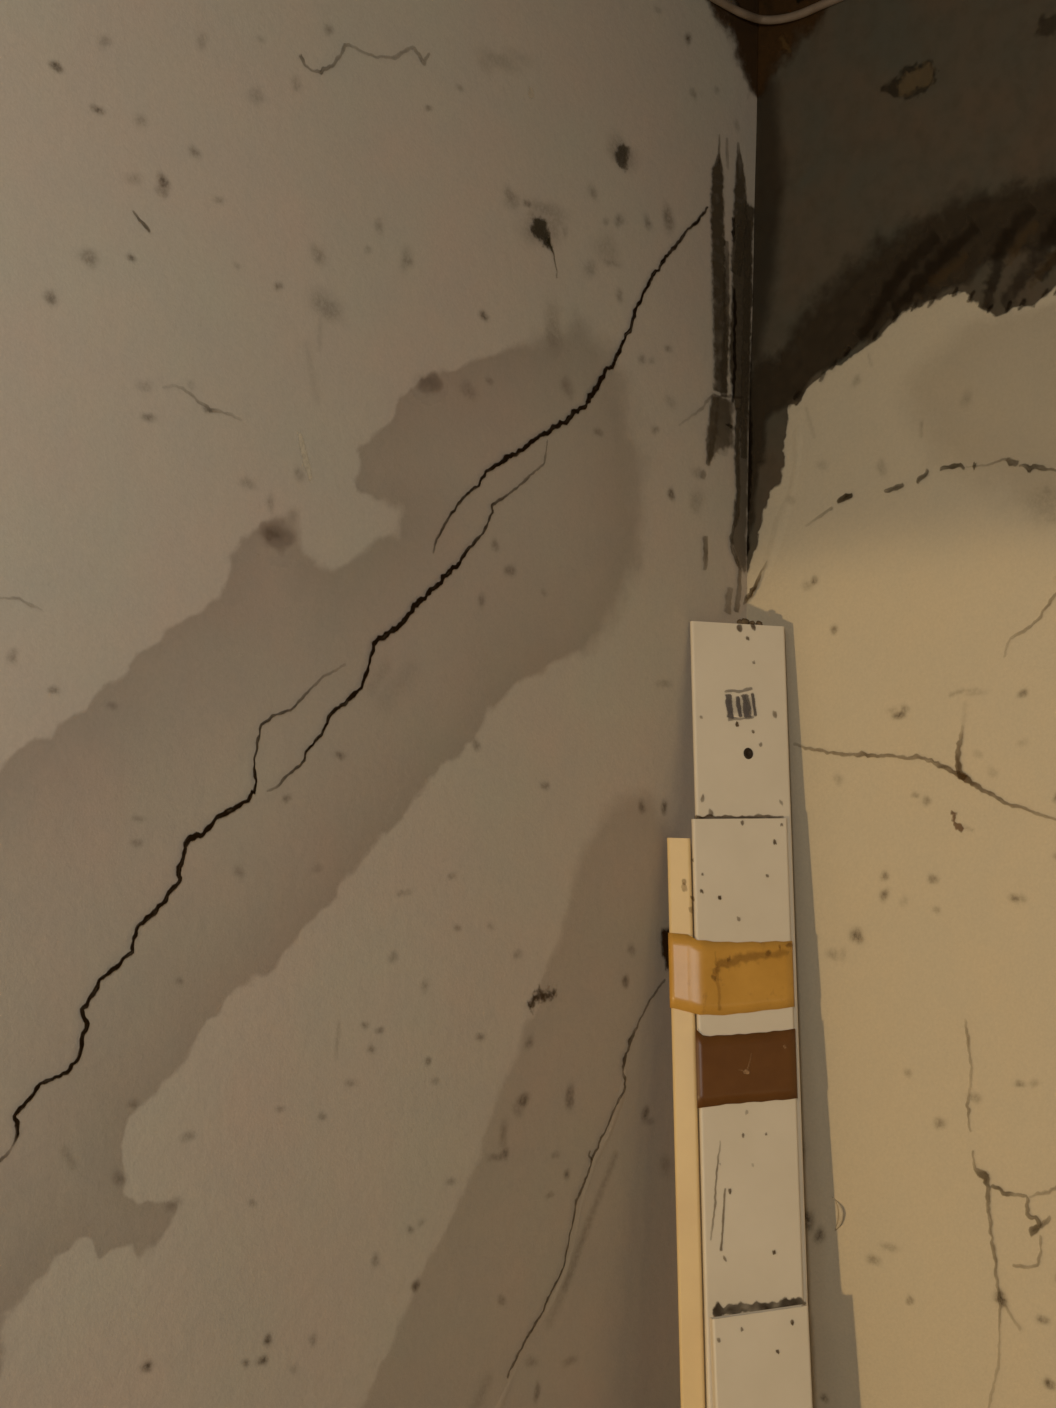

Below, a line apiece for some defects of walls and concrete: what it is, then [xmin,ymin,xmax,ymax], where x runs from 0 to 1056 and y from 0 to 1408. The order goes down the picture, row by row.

crack [0,206,708,1161]
damp [707,148,751,577]
crack [837,493,852,503]
peeling [747,0,1056,571]
crack [887,459,1041,493]
crack [938,754,1005,802]
crack [508,991,656,1377]
crack [977,1171,1041,1236]